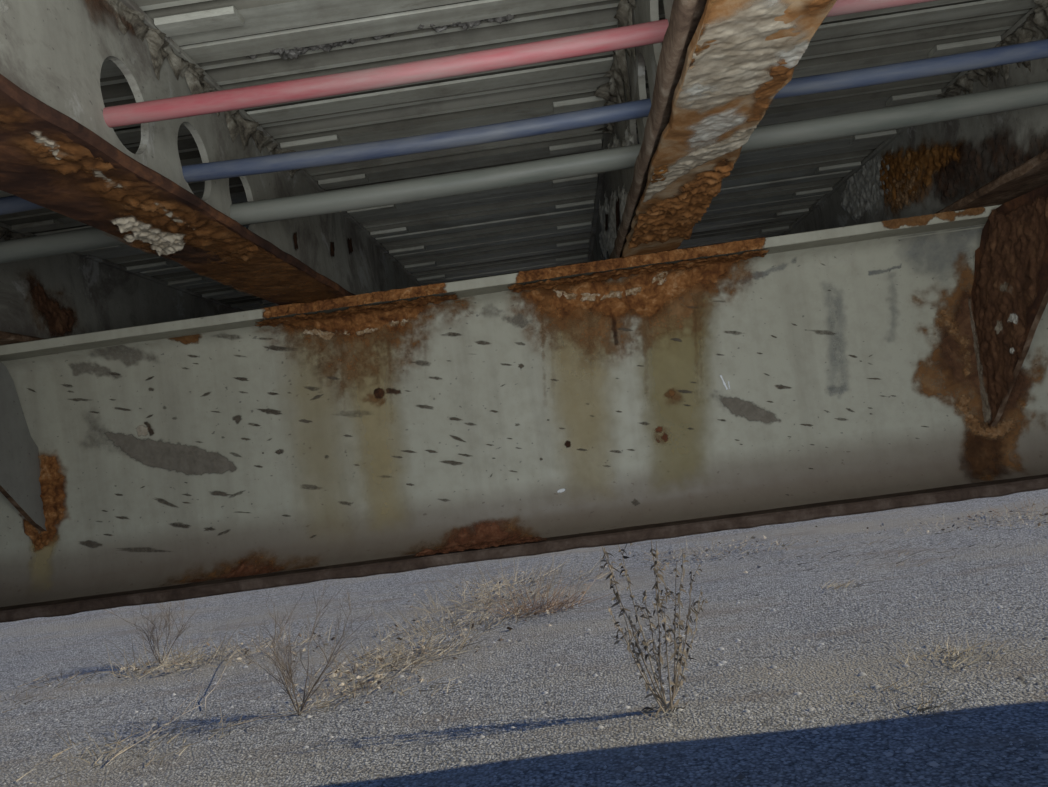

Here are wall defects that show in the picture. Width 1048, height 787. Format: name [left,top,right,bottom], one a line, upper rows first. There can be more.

peeling [85,0,135,33]
corrosion [804,0,837,15]
corrosion [745,60,796,123]
peeling [33,133,61,160]
peeling [112,204,228,264]
corrosion [18,138,469,517]
corrosion [508,159,769,476]
corrosion [841,132,1048,481]
corrosion [20,454,66,573]
corrosion [408,520,546,557]